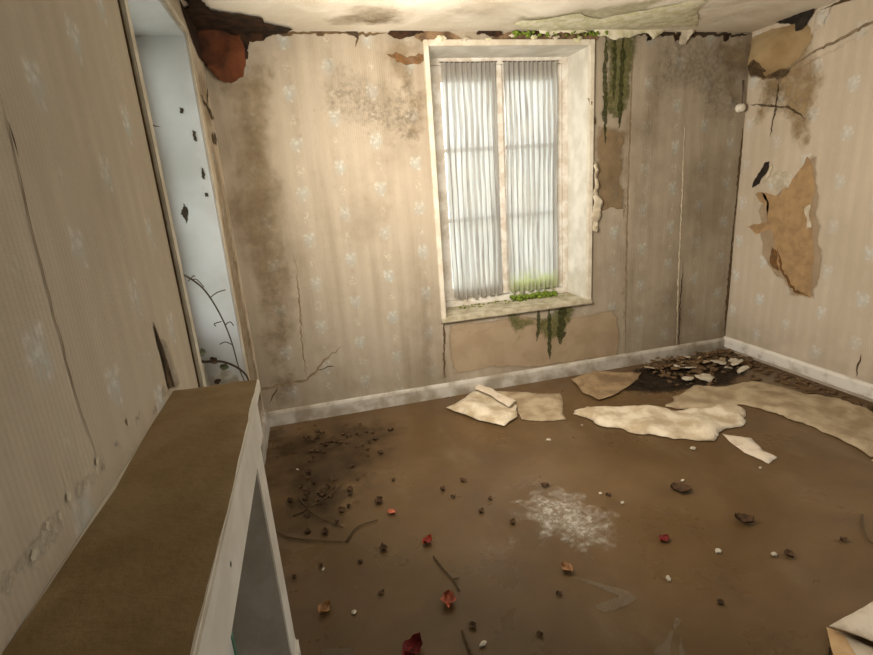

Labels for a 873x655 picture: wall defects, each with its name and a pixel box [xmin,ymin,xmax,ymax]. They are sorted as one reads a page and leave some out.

crack [820,0,850,10]
leakage [387,52,424,65]
crack [777,21,873,84]
leakage [750,48,816,142]
peeling [591,116,625,233]
peeling [747,157,821,298]
crack [0,95,100,464]
crack [153,322,180,389]
leakage [450,311,619,373]